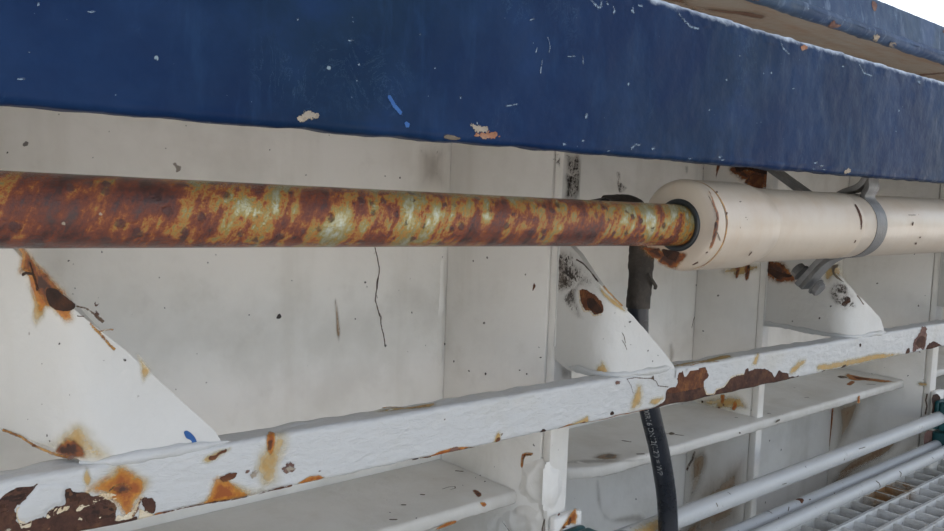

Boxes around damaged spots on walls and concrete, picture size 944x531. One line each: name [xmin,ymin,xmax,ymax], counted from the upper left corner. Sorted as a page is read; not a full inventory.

peeling [470,123,499,139]
rust [716,165,767,189]
rust [641,180,728,269]
rust [19,249,76,320]
crack [375,247,386,347]
rust [578,286,625,316]
rust [0,429,324,531]